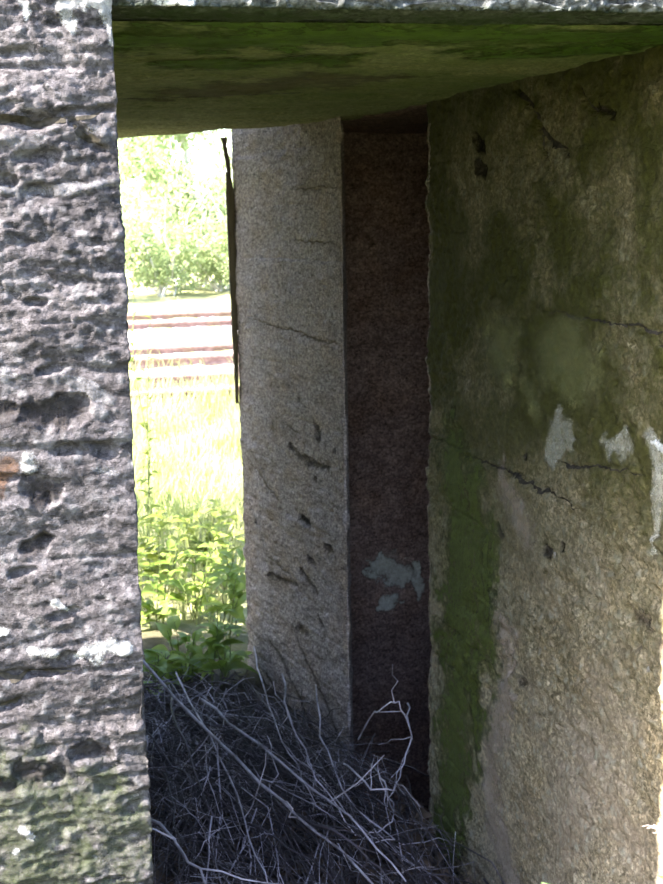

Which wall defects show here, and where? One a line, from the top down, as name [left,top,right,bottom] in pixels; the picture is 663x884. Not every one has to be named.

damp [18,0,32,21]
damp [56,0,113,46]
crack [249,317,337,344]
crack [545,310,663,348]
crack [436,438,577,510]
crack [554,461,645,475]
damp [650,469,663,554]